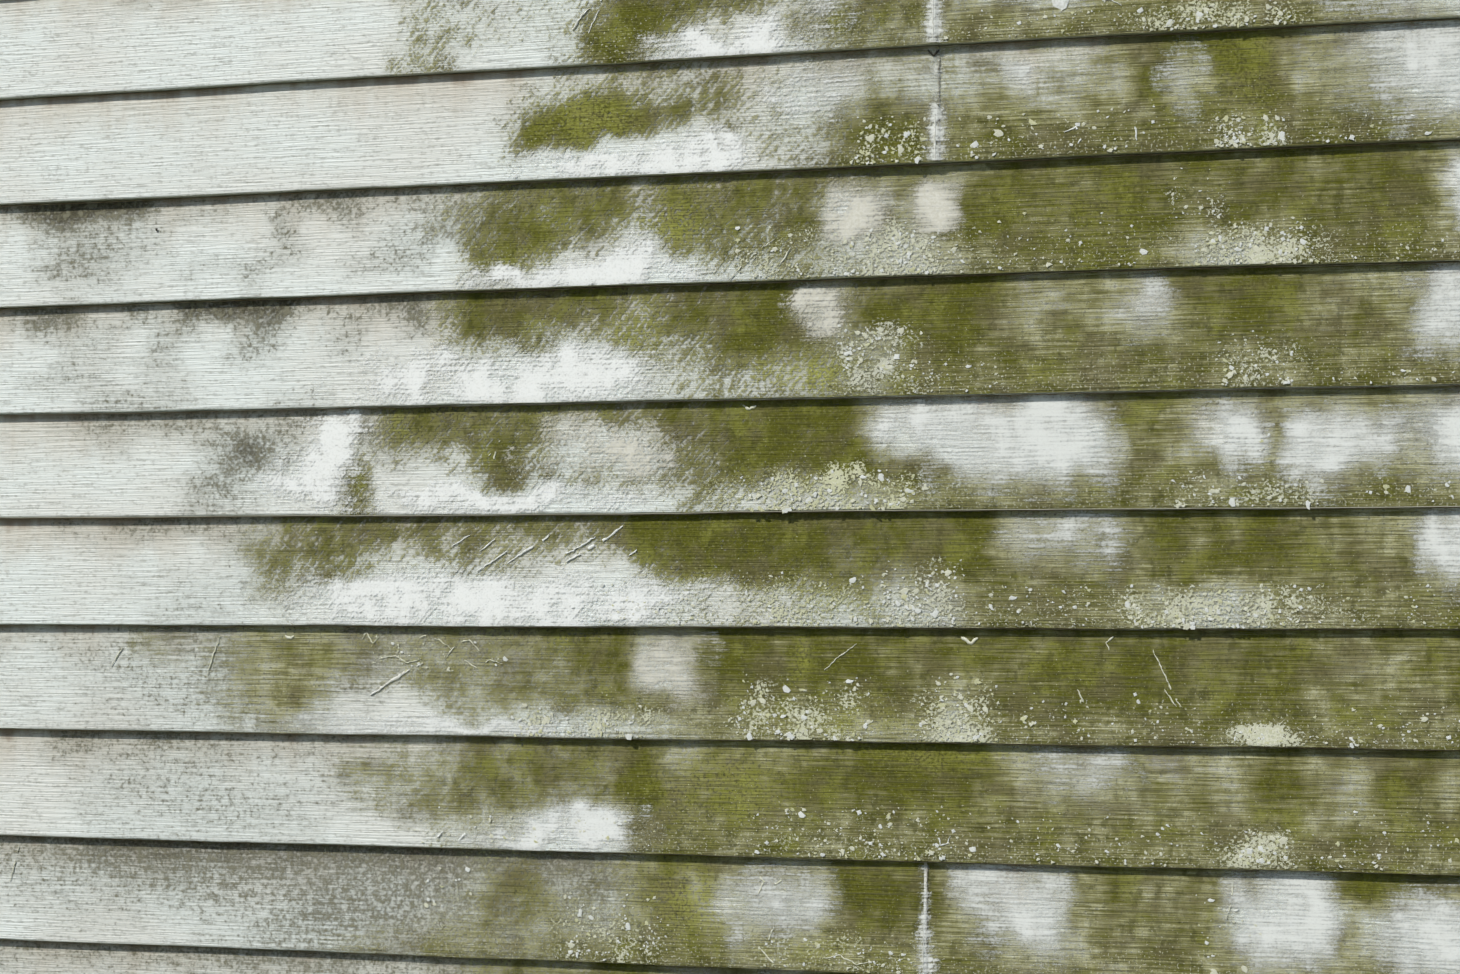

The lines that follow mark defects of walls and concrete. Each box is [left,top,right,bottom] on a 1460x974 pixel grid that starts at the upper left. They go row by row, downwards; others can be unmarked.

mould [239,180,602,278]
mould [8,307,98,343]
damp [79,292,498,589]
damp [358,406,541,465]
mould [0,599,634,974]